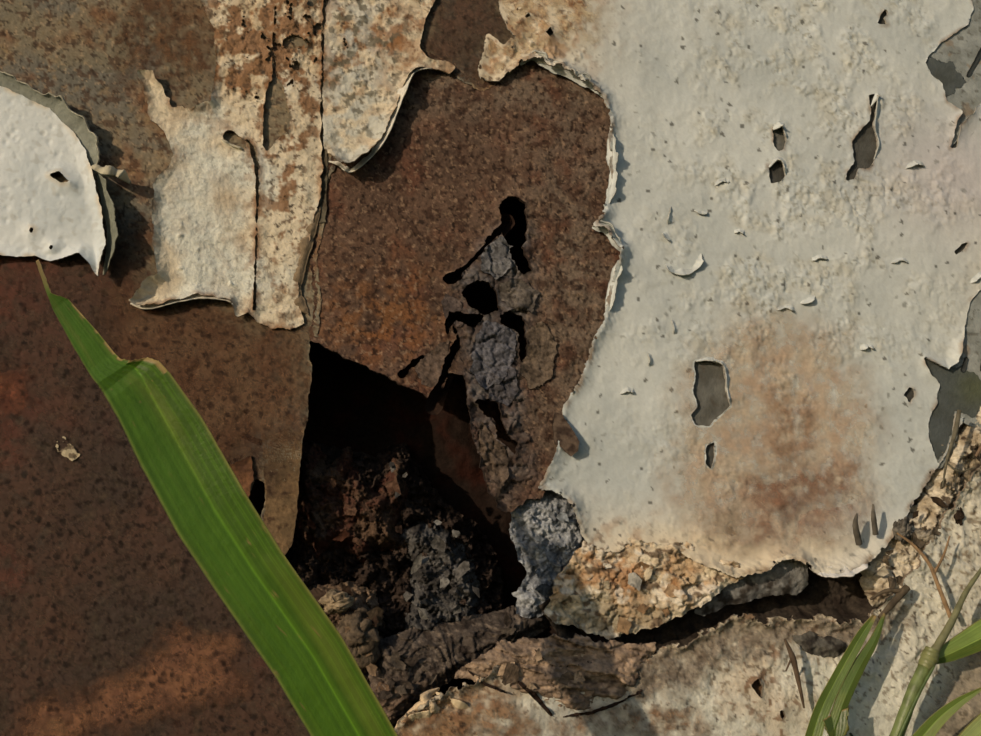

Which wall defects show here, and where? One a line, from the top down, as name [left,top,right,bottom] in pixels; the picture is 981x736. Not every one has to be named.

peeling [0,71,131,276]
peeling [129,0,455,330]
peeling [846,92,881,181]
peeling [926,0,981,148]
rust [0,0,624,736]
peeling [691,356,731,426]
rust [684,327,865,540]
crack [908,422,981,515]
peeling [924,272,981,469]
peeling [544,538,746,640]
crack [539,559,880,658]
rust [613,708,704,733]